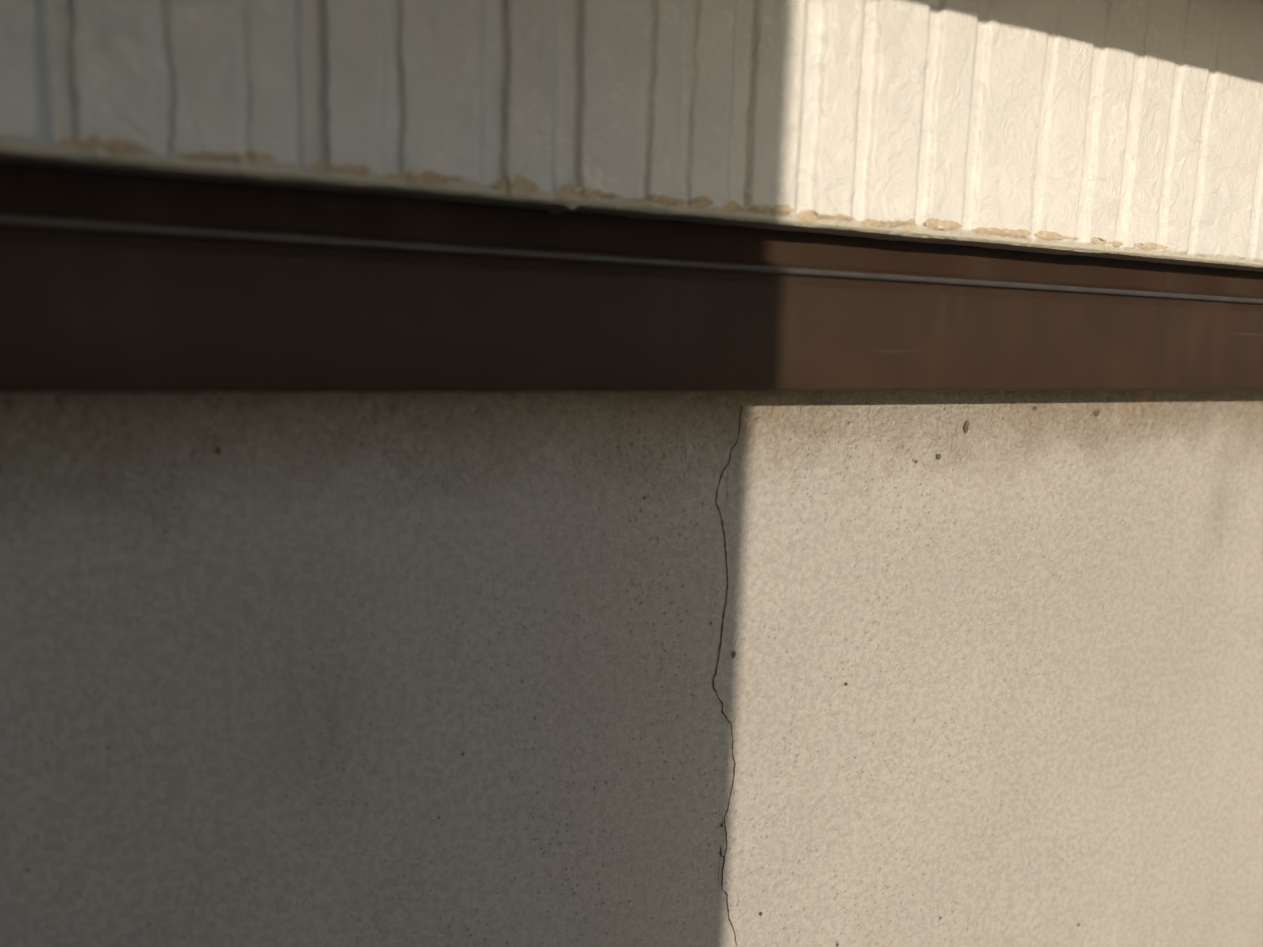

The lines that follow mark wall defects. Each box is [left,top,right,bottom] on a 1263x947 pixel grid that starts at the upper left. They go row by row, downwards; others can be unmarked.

crack [711,405,742,945]